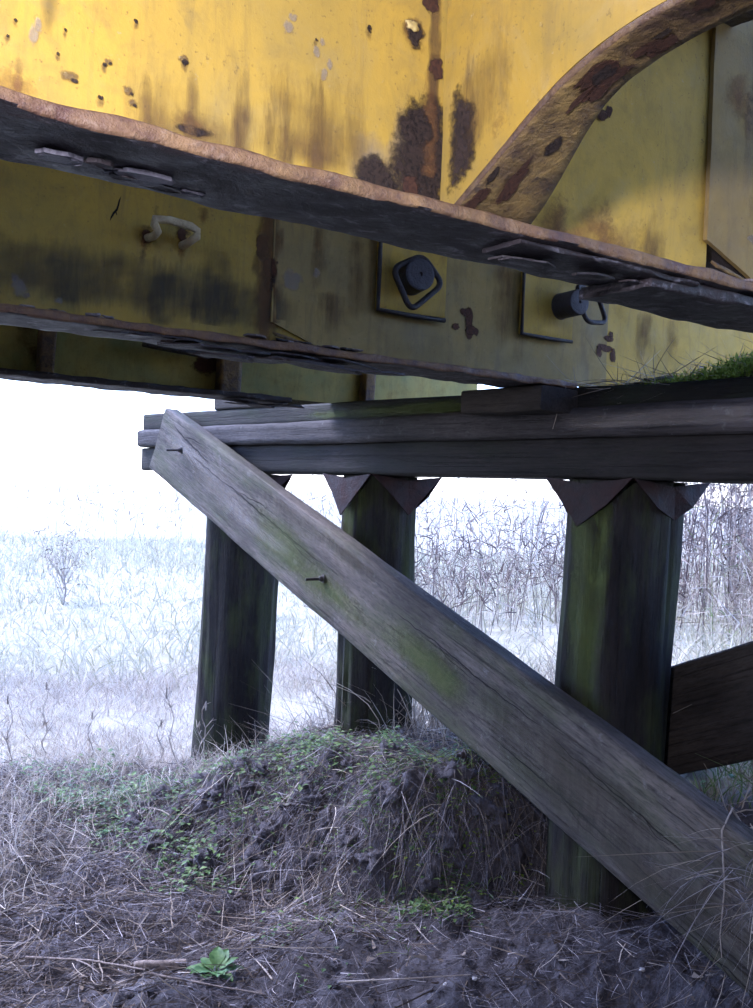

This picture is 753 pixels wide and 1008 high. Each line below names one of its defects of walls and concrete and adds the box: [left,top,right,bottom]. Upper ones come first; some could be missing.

rust [565,27,679,121]
rust [356,86,475,200]
rust [464,136,563,214]
rust [452,307,479,339]
rust [596,332,616,362]